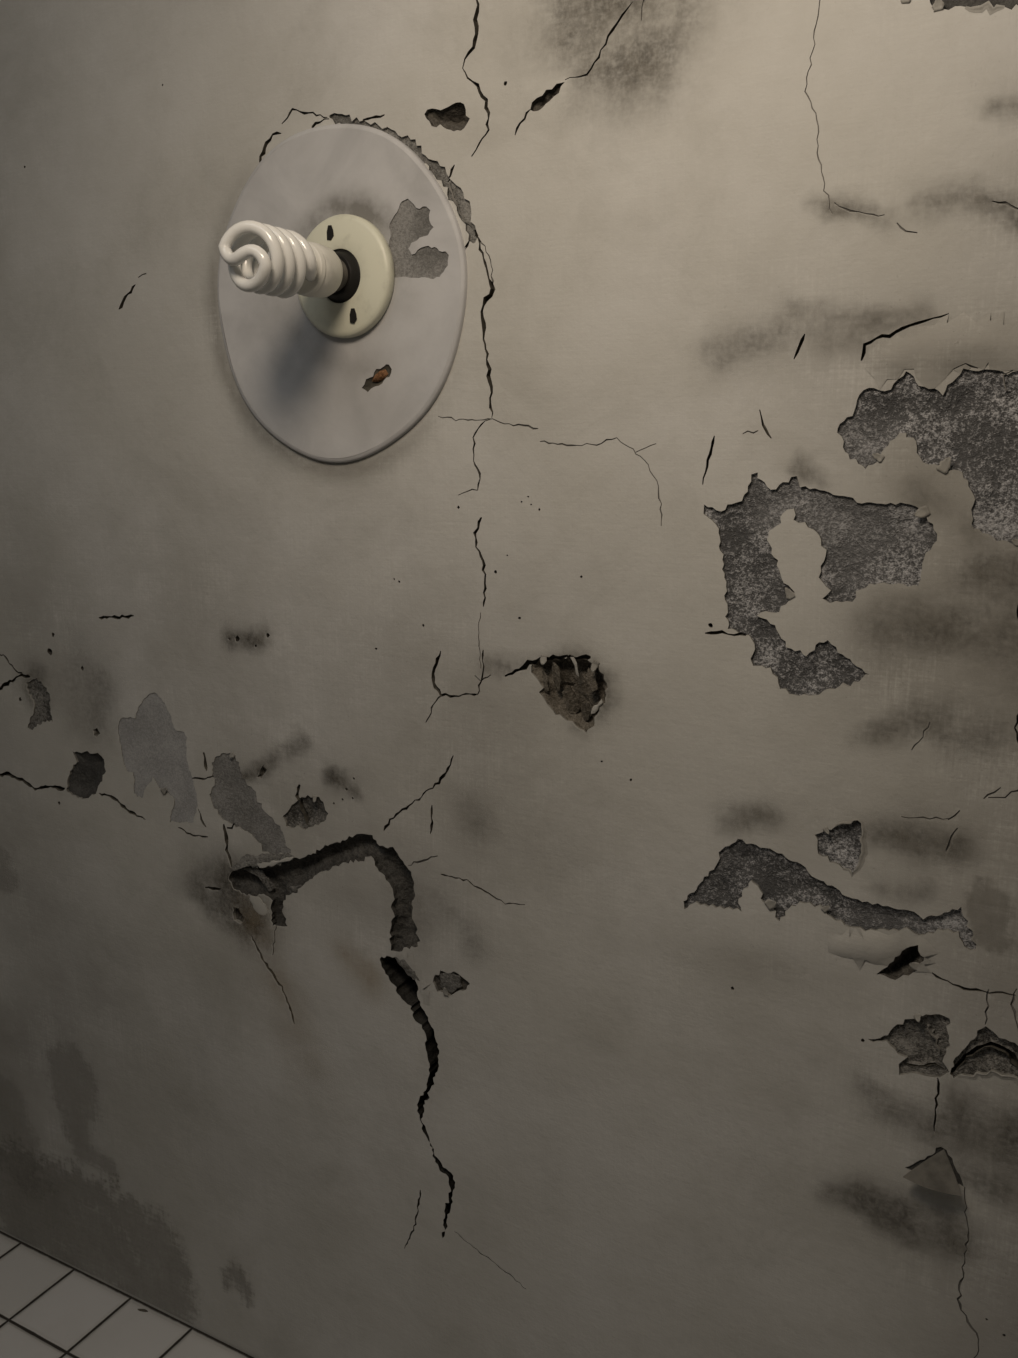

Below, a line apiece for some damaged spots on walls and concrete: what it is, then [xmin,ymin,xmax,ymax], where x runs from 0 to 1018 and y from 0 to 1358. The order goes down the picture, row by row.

flaking render [930,0,1018,15]
flaking render [424,102,470,131]
corrosion [362,364,392,392]
crack [259,0,663,723]
crack [702,410,771,485]
crack [860,313,949,361]
flaking render [837,369,1018,546]
flaking render [704,473,937,696]
flaking render [684,839,976,980]
crack [178,752,526,1289]
flaking render [861,1013,1018,1085]
crack [904,972,1018,1132]